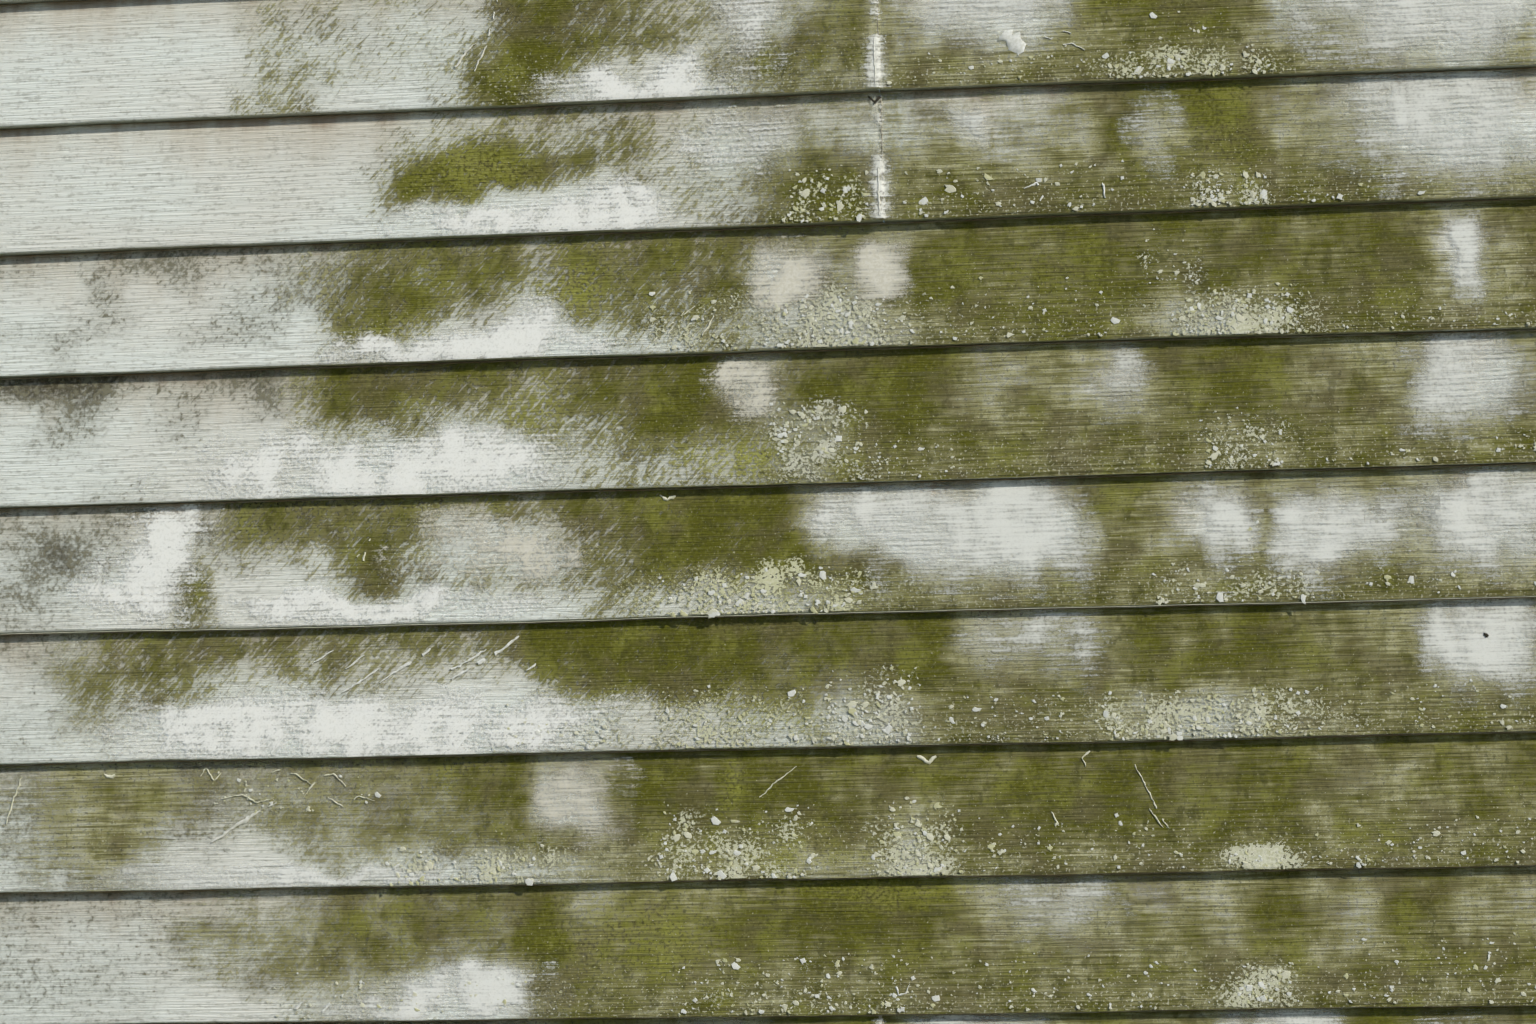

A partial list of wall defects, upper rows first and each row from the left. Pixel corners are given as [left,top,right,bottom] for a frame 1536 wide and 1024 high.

mould [0,239,491,448]
water stain [195,499,423,570]
mould [0,729,228,1008]
mould [170,760,356,852]